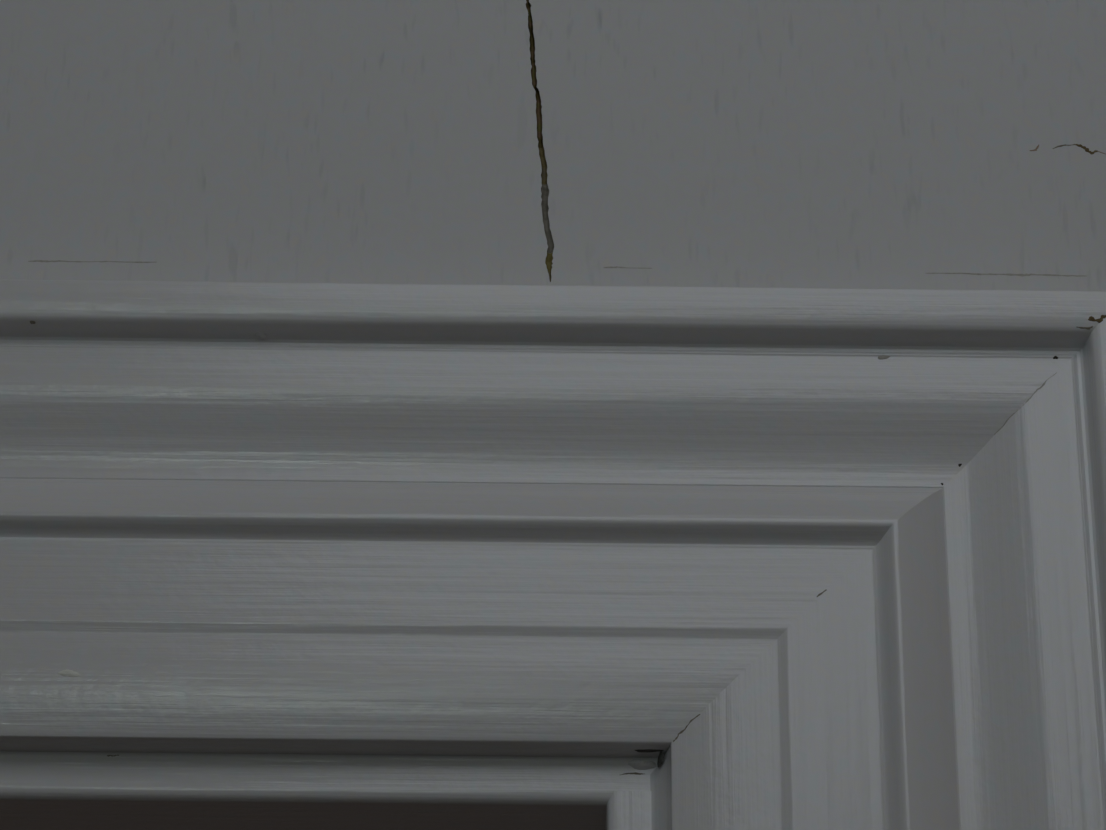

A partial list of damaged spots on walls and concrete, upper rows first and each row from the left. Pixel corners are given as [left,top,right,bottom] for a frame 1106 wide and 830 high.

crack [526,0,554,282]
crack [1030,144,1105,154]